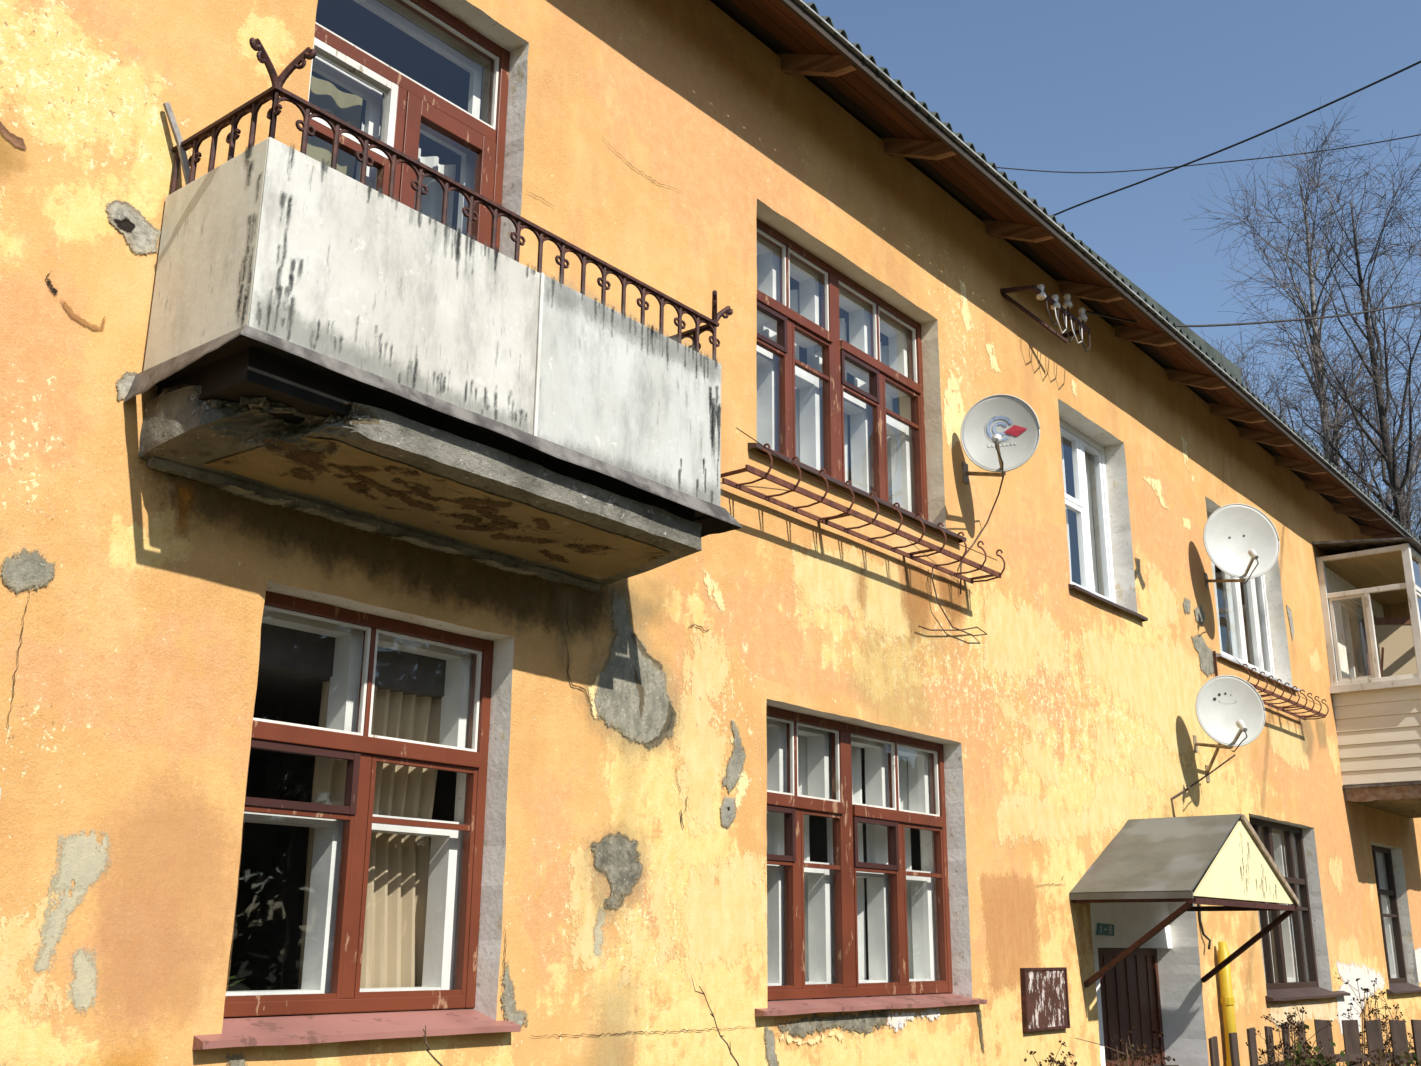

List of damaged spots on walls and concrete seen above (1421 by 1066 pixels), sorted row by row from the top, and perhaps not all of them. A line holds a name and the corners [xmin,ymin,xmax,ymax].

spalling [106,200,161,254]
leakage [236,143,303,338]
leakage [418,209,499,273]
leakage [465,380,527,425]
spalling [221,486,377,532]
leakage [165,472,610,630]
peeling [253,438,618,563]
peeling [702,569,726,612]
crack [8,600,29,727]
peeling [587,592,751,839]
peeling [0,830,111,1027]
peeling [567,831,767,991]